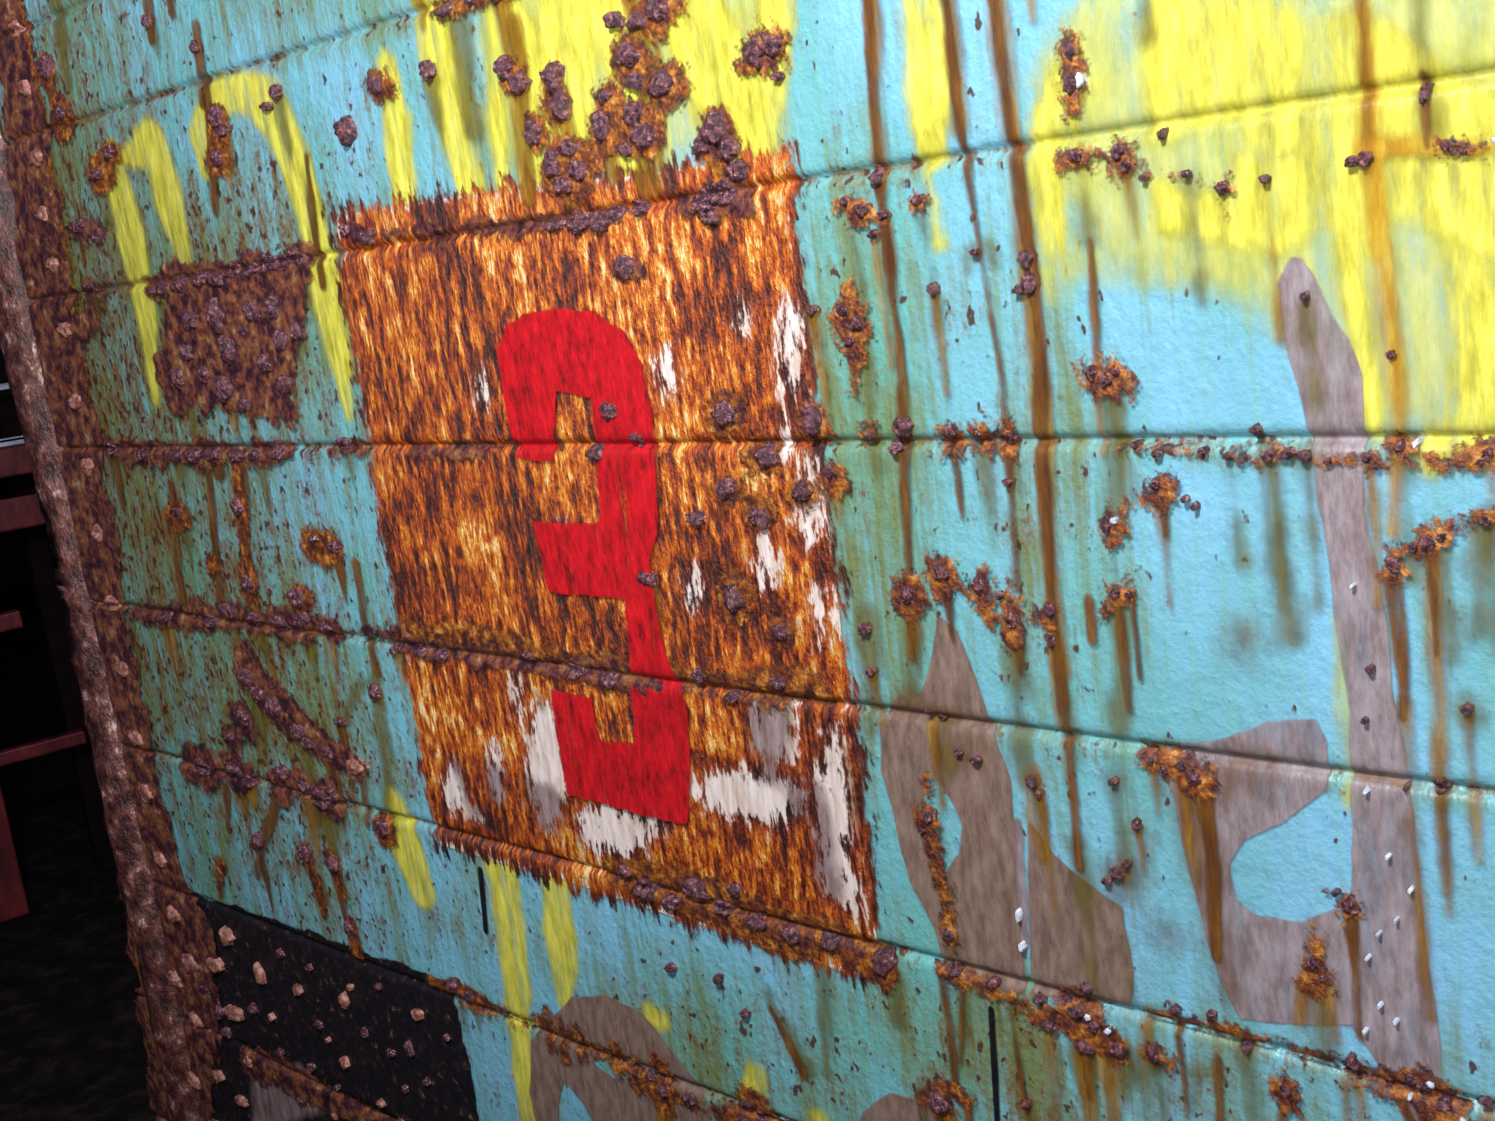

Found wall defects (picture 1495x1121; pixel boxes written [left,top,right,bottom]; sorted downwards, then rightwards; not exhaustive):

rust [0,0,1144,1121]
rust [911,707,1495,1121]
rust [1053,0,1495,905]